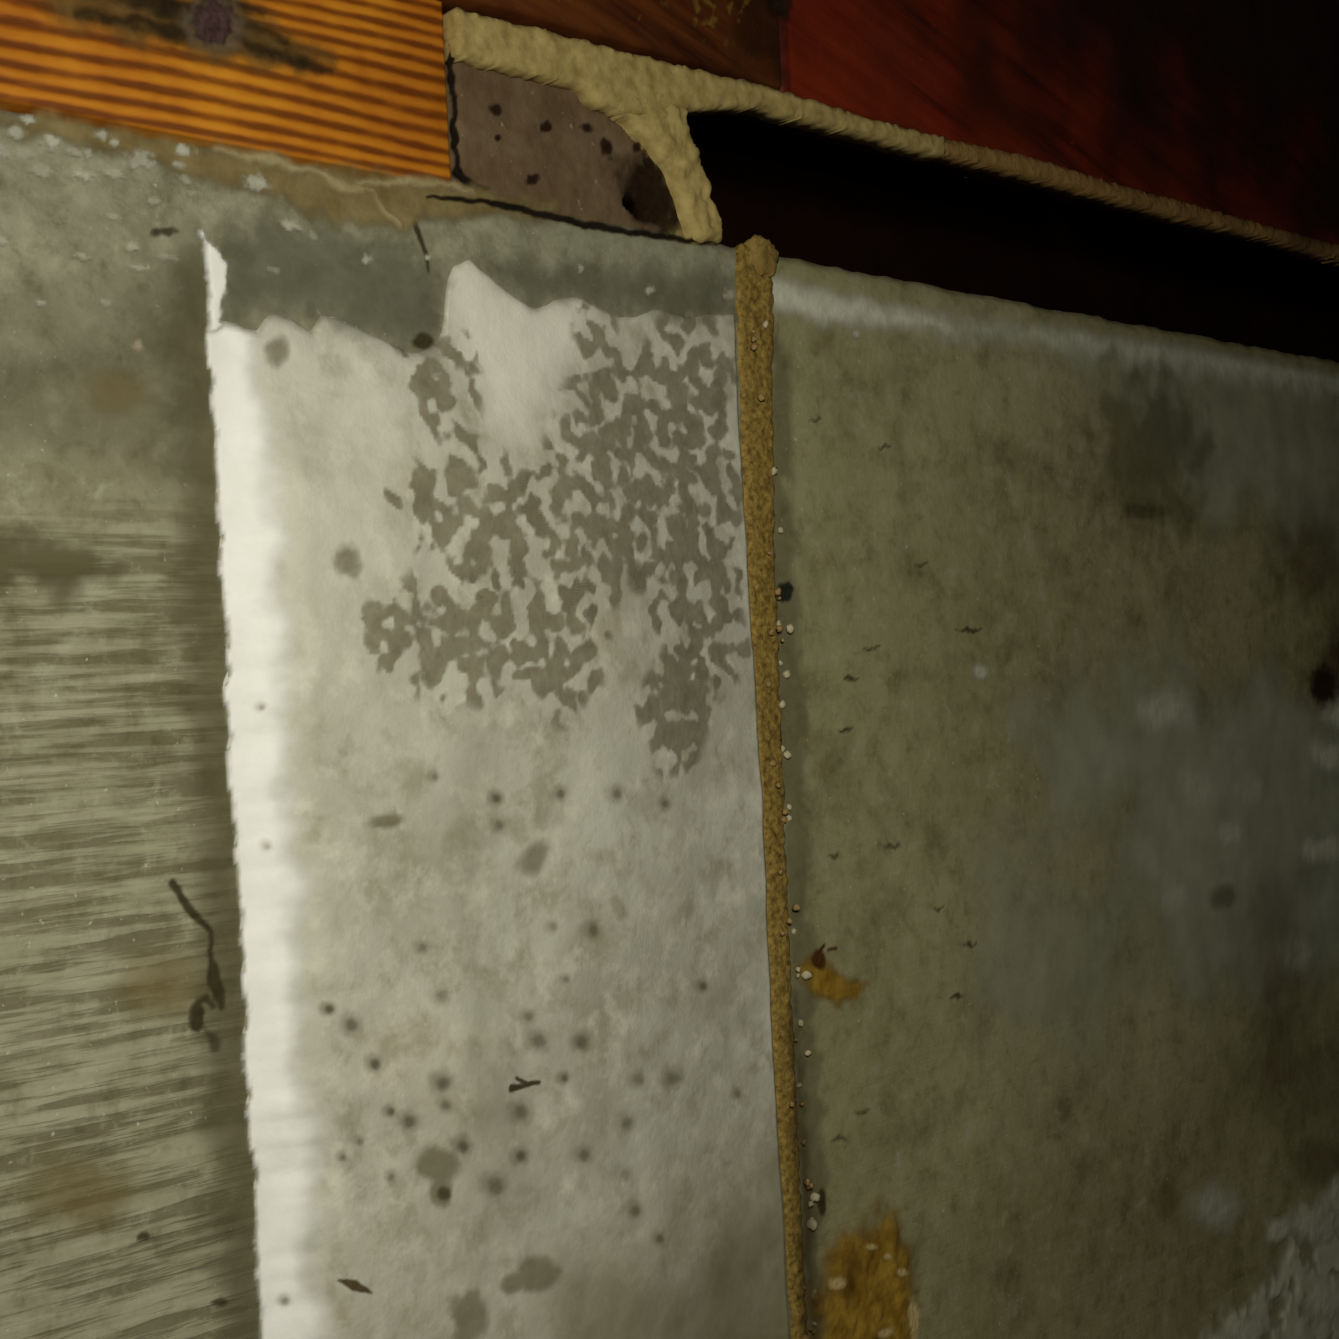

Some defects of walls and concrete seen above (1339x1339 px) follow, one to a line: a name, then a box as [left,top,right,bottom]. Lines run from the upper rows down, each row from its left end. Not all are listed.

crack [413,44,716,268]
peeling [268,341,286,362]
peeling [337,550,357,573]
peeling [363,304,750,773]
damp [376,816,398,825]
crack [169,879,224,1031]
rust [799,944,863,1005]
damp [420,1149,456,1203]
damp [504,1260,554,1290]
rust [813,1216,919,1339]
efflorescence [1211,1180,1339,1339]
damp [455,1293,484,1339]